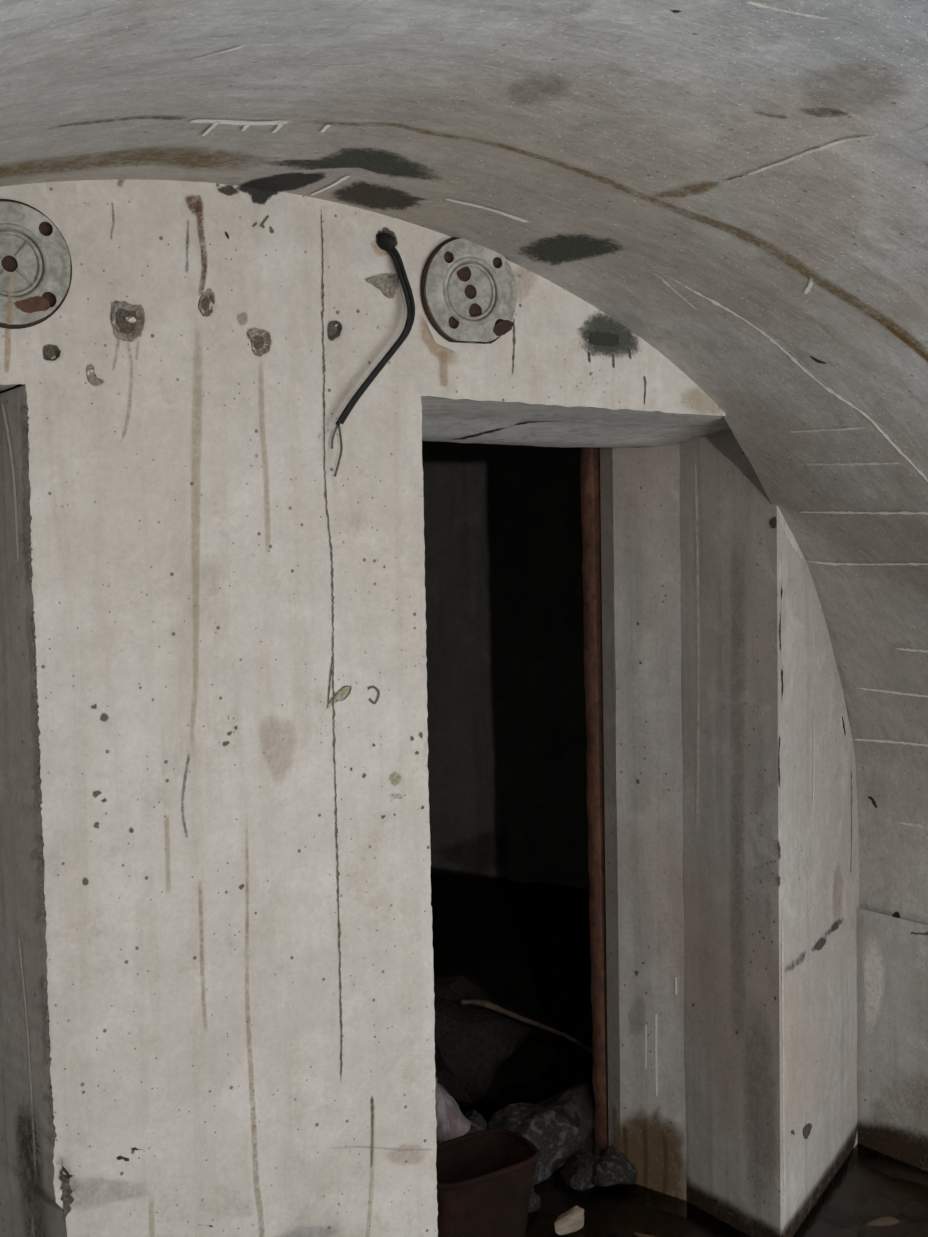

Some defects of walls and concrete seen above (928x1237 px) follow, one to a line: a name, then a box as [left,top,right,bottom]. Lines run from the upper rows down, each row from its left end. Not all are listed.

corrosion [0,199,72,369]
corrosion [186,196,207,293]
water stain [218,149,437,210]
corrosion [420,237,514,383]
water stain [521,234,622,265]
corrosion [487,142,928,361]
crack [661,137,871,197]
water stain [2,401,19,565]
crack [321,214,343,1078]
water stain [18,938,45,1237]
crack [368,1098,376,1165]
water stain [687,1124,928,1237]